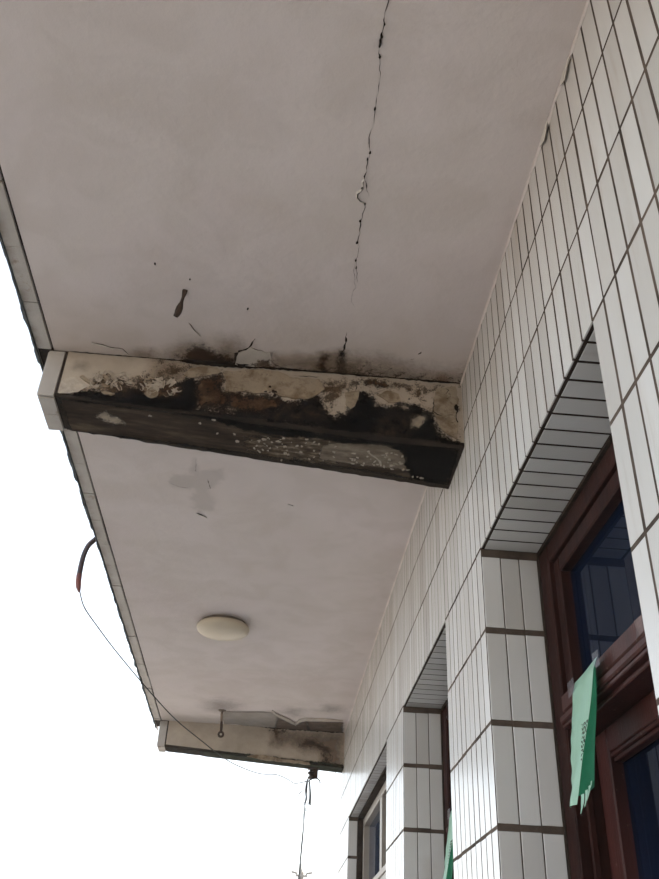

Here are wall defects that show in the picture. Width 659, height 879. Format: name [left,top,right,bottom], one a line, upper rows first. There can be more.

crack [351,0,389,305]
peeling [59,339,329,400]
peeling [97,412,123,424]
leakage [59,347,461,485]
peeling [345,390,359,409]
peeling [401,386,459,440]
spalling [233,433,424,479]
spalling [223,710,344,732]
leakage [170,729,343,773]